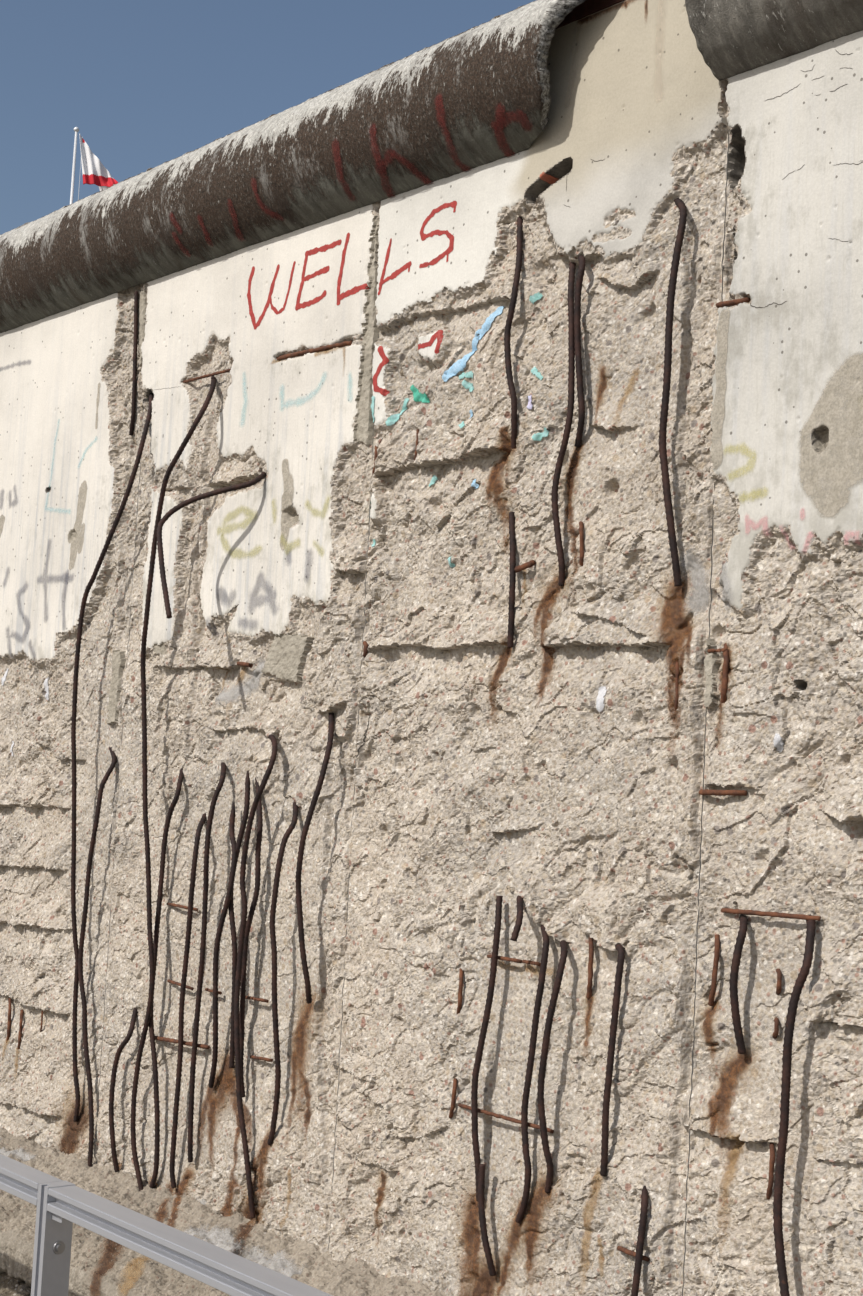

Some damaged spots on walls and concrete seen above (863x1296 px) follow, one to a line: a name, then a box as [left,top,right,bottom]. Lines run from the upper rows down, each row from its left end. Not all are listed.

corrosion [487,427,516,518]
corrosion [565,444,582,566]
spalling [0,283,169,1184]
corrosion [489,643,511,708]
spalling [145,79,863,1296]
corrosion [534,577,562,702]
corrosion [661,582,692,728]
corrosion [60,1103,88,1155]
corrosion [198,1055,270,1256]
corrosion [289,1002,313,1129]
corrosion [709,1053,749,1200]
corrosion [463,1183,551,1296]